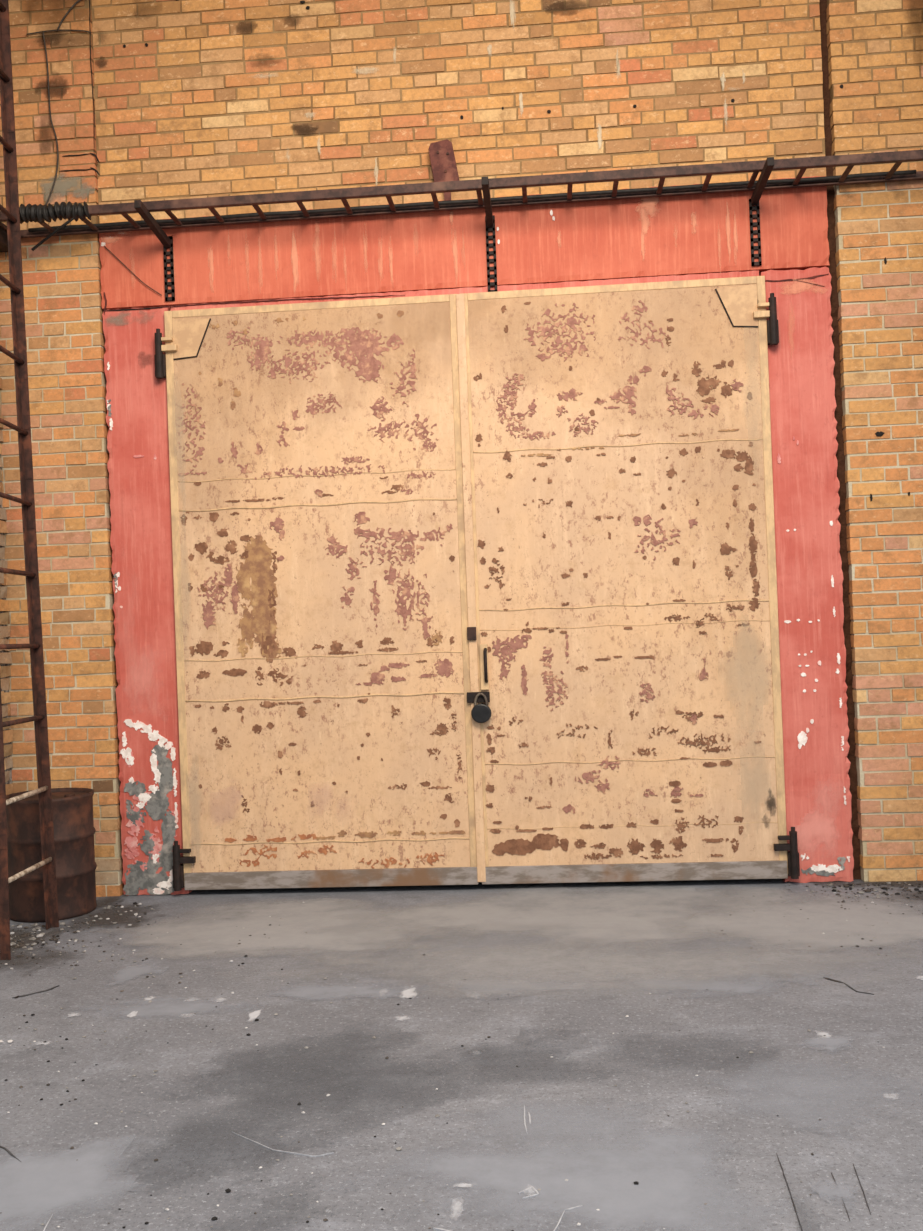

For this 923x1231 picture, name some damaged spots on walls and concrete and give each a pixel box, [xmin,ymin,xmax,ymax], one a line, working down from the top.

water stain [548,1,578,12]
peeling [209,310,439,452]
peeling [119,719,179,895]
peeling [180,497,306,686]
peeling [195,700,321,734]
peeling [218,441,435,497]
peeling [312,512,455,704]
peeling [481,622,655,711]
peeling [485,781,744,860]
peeling [496,360,752,568]
peeling [632,710,732,767]
peeling [664,442,760,635]